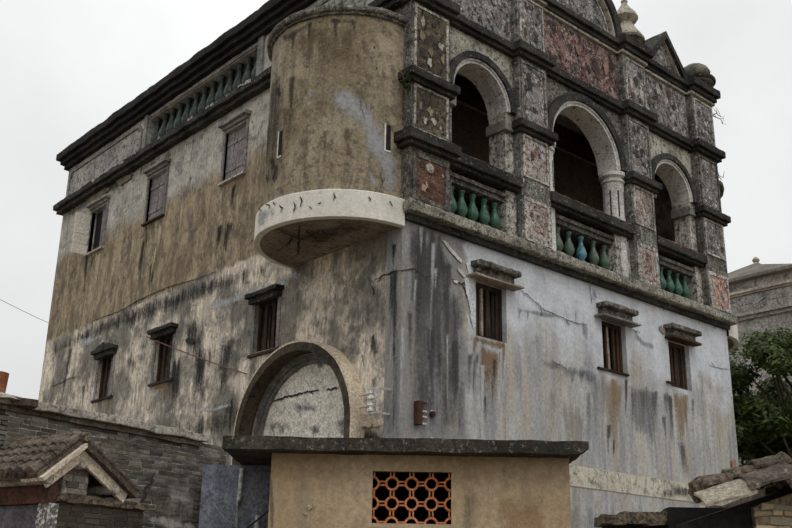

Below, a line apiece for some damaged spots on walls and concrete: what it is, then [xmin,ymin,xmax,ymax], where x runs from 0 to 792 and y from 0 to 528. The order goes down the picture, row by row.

damp [266,78,294,182]
damp [55,270,300,396]
crack [371,268,427,294]
damp [390,228,462,425]
crack [520,290,587,325]
damp [169,400,237,434]
crack [272,387,337,402]
damp [469,354,506,409]
damp [625,380,673,435]
crack [139,471,155,503]